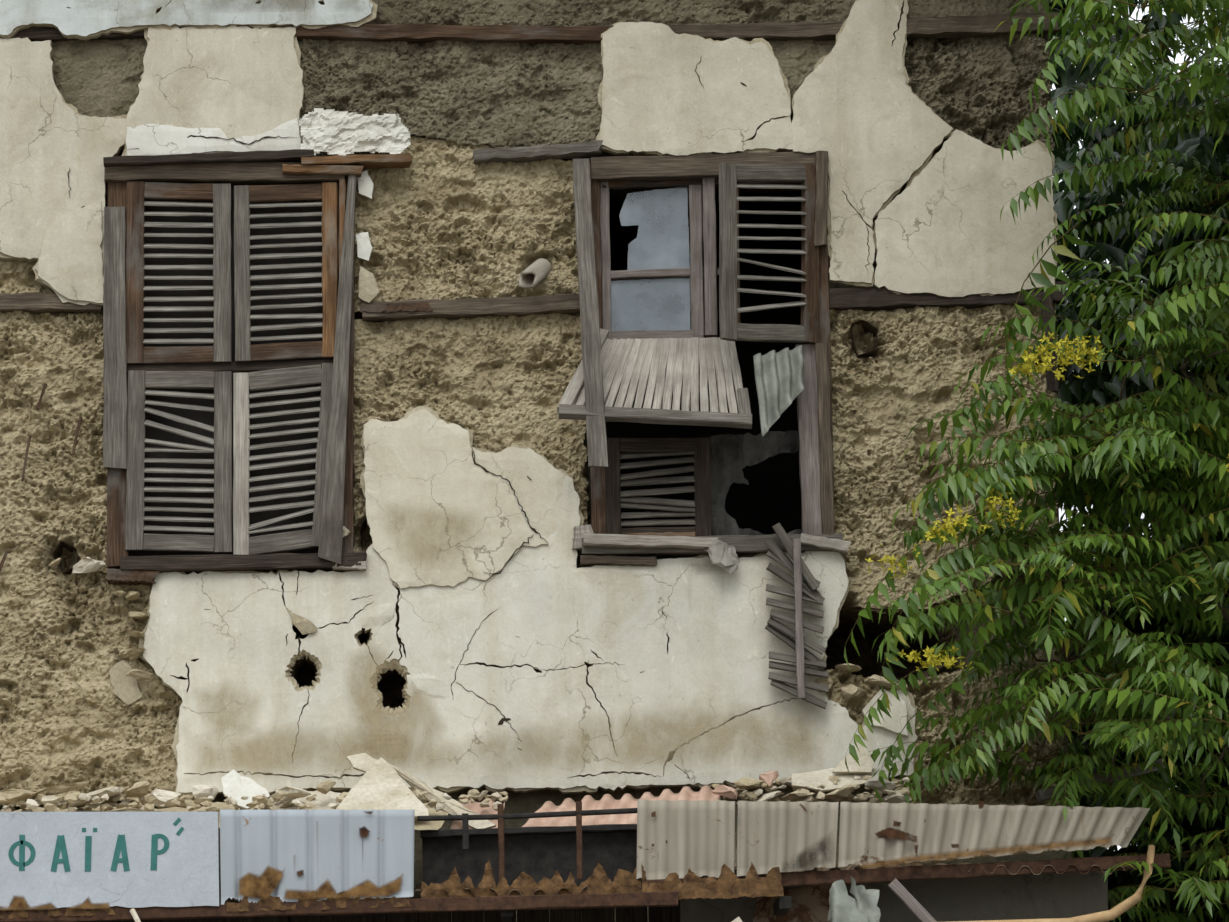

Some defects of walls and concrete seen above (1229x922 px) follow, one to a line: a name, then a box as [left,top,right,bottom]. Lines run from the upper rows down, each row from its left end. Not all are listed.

flaking render [51,39,147,117]
crack [930,129,954,160]
flaking render [904,33,1055,152]
flaking render [298,0,856,552]
flaking render [0,310,183,807]
crack [471,446,548,575]
flaking render [829,303,1060,615]
crack [286,587,406,666]
crack [210,698,364,778]
crack [451,608,783,778]
rust [359,811,373,838]
rust [227,839,829,912]